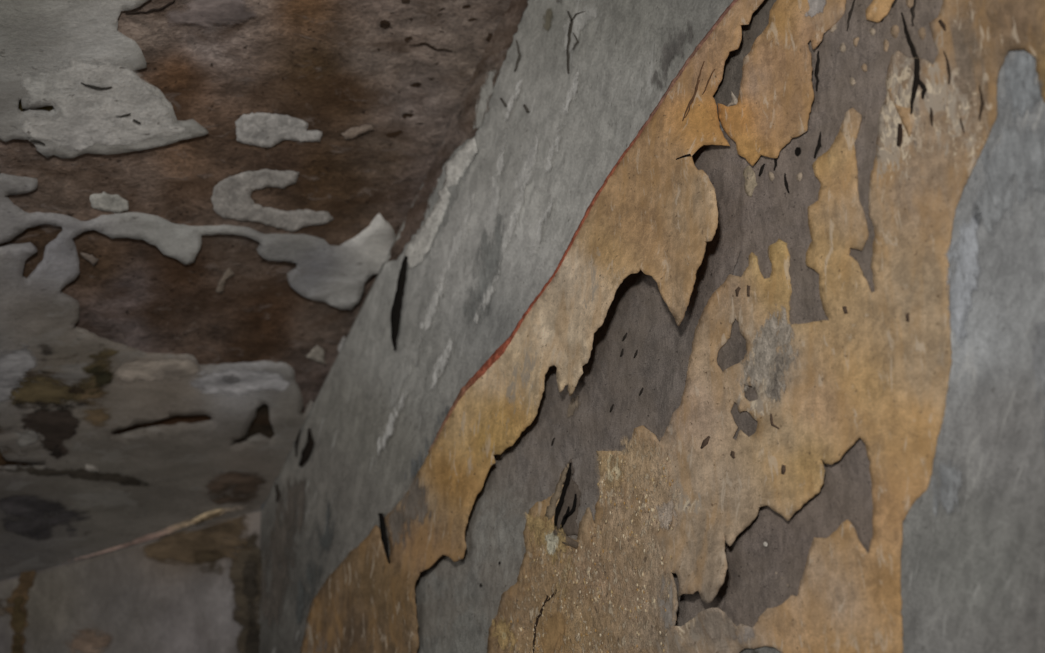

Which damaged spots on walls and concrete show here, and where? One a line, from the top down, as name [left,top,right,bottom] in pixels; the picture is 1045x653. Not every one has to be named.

leakage [0,495,89,540]
leakage [0,349,149,486]
spalling [0,0,511,414]
peeling [300,0,1045,653]